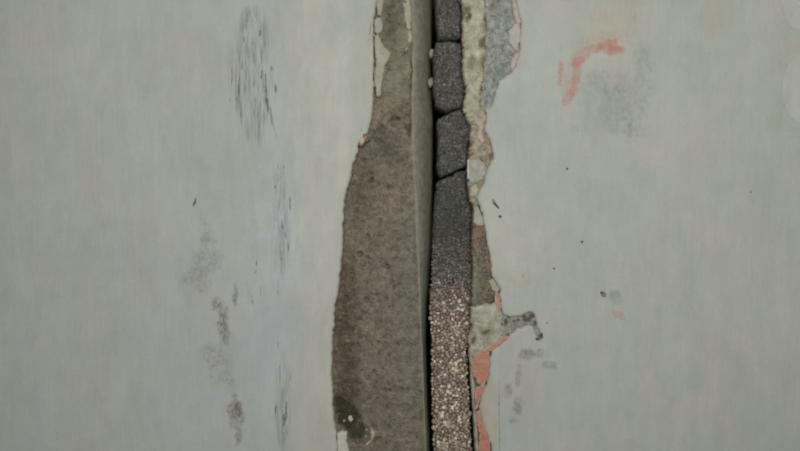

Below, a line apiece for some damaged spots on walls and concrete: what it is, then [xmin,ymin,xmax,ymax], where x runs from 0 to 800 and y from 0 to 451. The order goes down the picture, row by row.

flaking render [332,0,425,451]
flaking render [460,0,521,451]